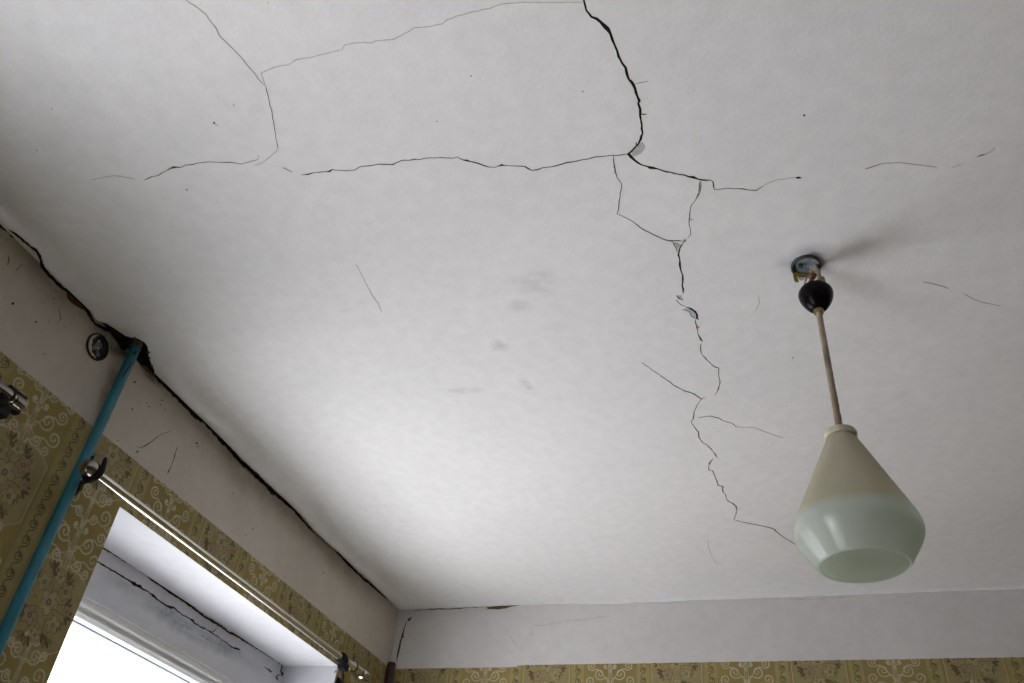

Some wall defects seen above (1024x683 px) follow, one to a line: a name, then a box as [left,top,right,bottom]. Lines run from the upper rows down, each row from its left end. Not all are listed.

crack [866,149,994,169]
crack [91,0,801,545]
crack [0,224,388,599]
crack [97,548,283,680]
crack [396,605,606,662]